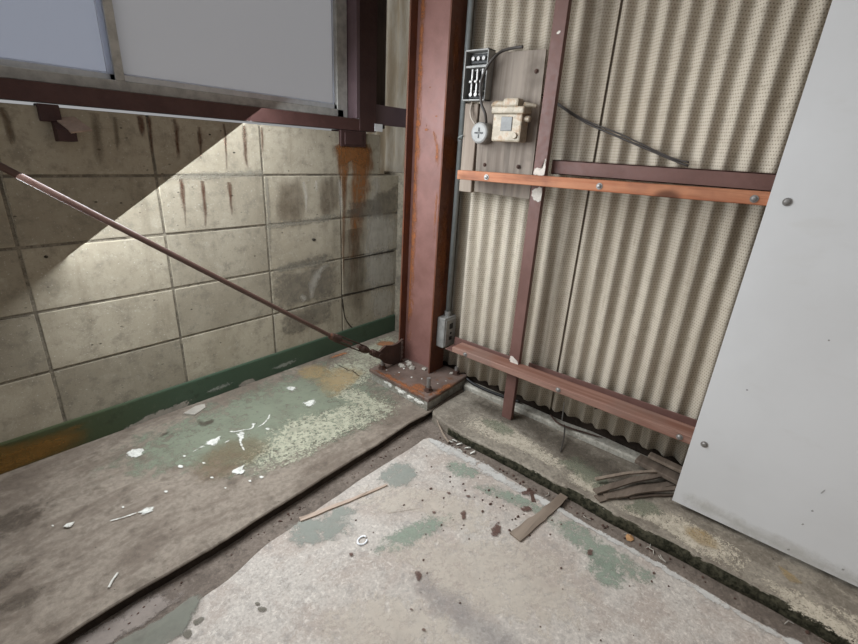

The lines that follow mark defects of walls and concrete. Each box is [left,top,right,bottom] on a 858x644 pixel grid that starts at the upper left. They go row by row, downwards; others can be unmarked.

damp [138,116,152,148]
rust [336,145,373,258]
rust [408,0,457,320]
rust [0,434,77,472]